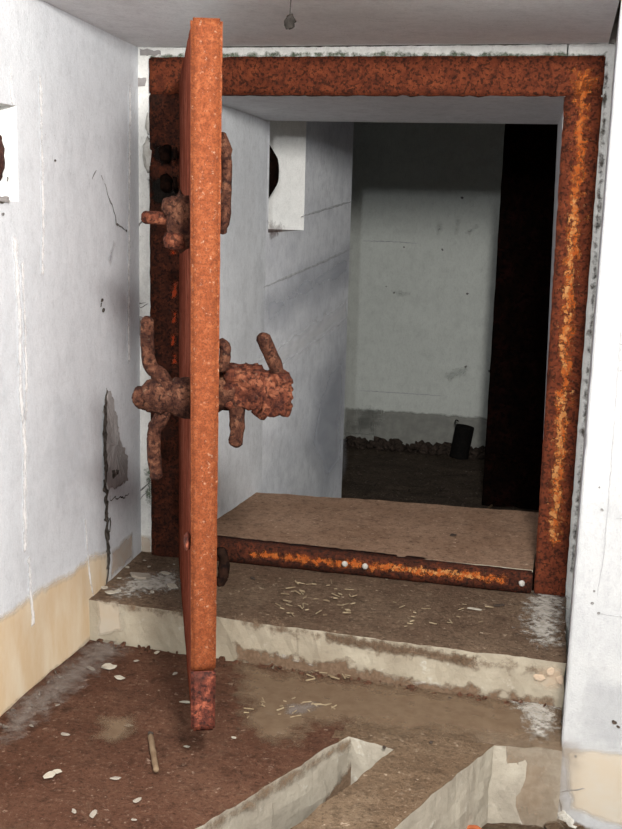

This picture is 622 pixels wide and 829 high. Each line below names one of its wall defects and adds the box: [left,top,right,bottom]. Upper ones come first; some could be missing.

corrosion [545,68,599,546]
spalling [102,388,128,490]
crack [103,479,151,584]
corrosion [141,537,150,552]
corrosion [250,550,506,585]